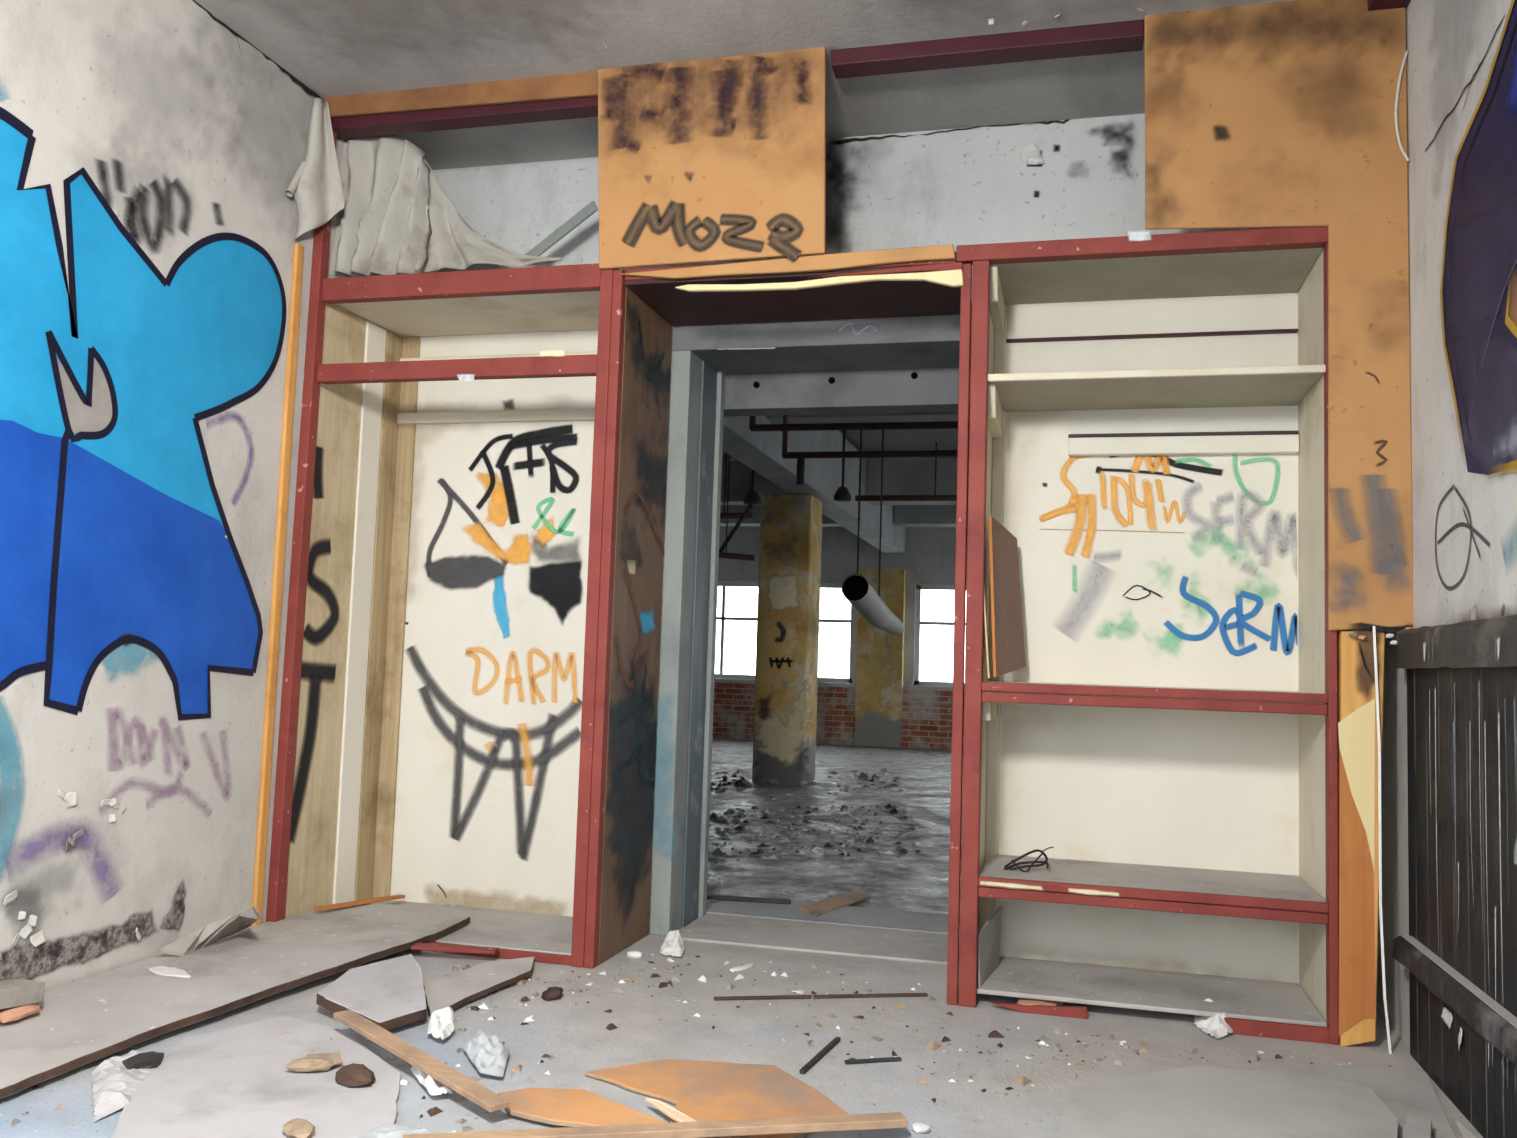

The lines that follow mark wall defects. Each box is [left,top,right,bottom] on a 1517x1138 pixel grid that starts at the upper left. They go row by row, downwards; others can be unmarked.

flaking render [0,881,186,981]